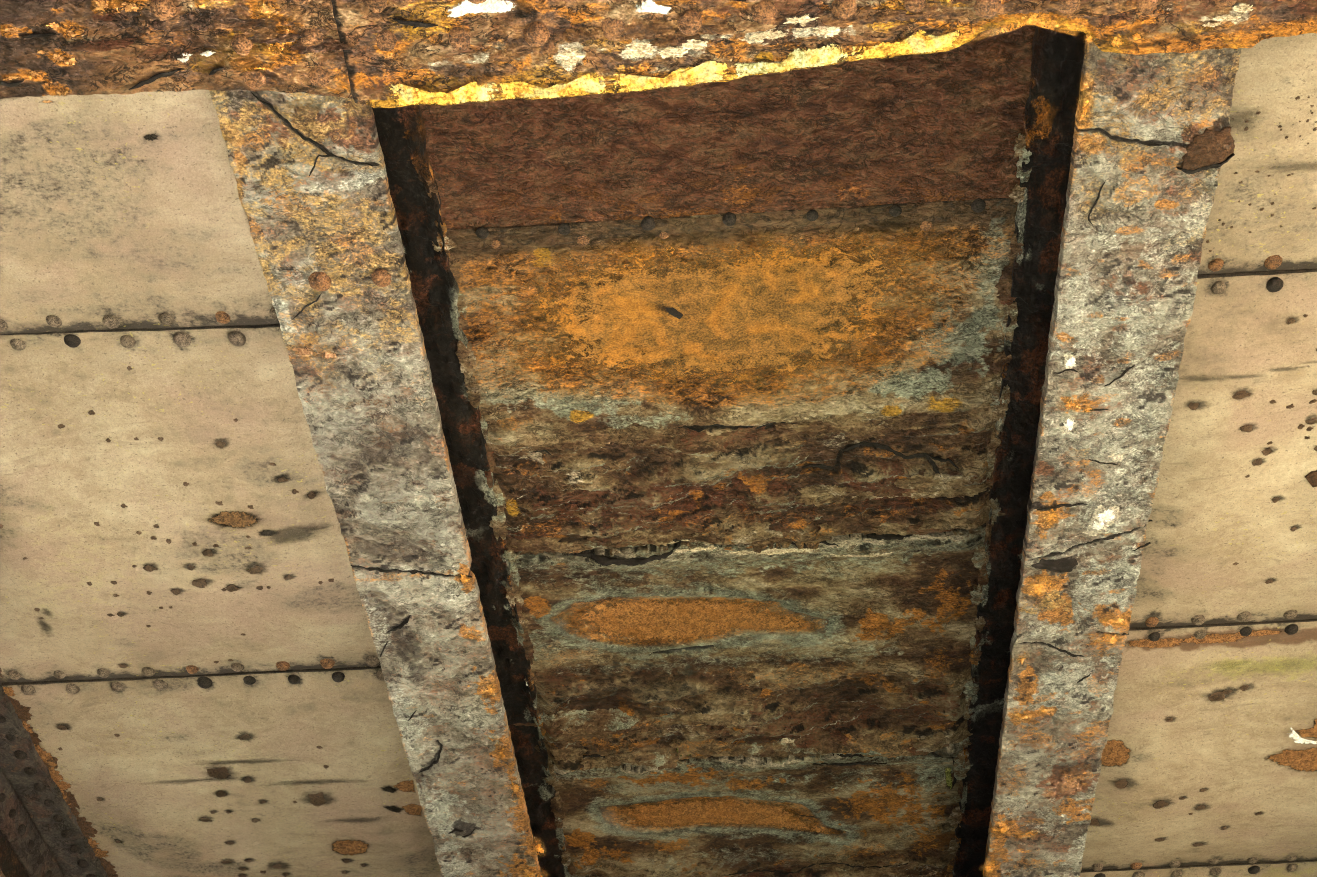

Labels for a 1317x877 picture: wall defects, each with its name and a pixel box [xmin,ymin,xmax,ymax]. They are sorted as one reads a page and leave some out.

crack [129,67,223,90]
rust [36,0,353,65]
rust [390,0,1136,106]
crack [251,92,378,176]
peeling [1176,111,1261,184]
crack [292,291,323,320]
peeling [146,501,321,609]
rust [455,233,1024,877]
rust [1031,556,1078,597]
spalling [1207,684,1254,702]
peeling [1101,740,1137,789]
peeling [1267,719,1317,772]